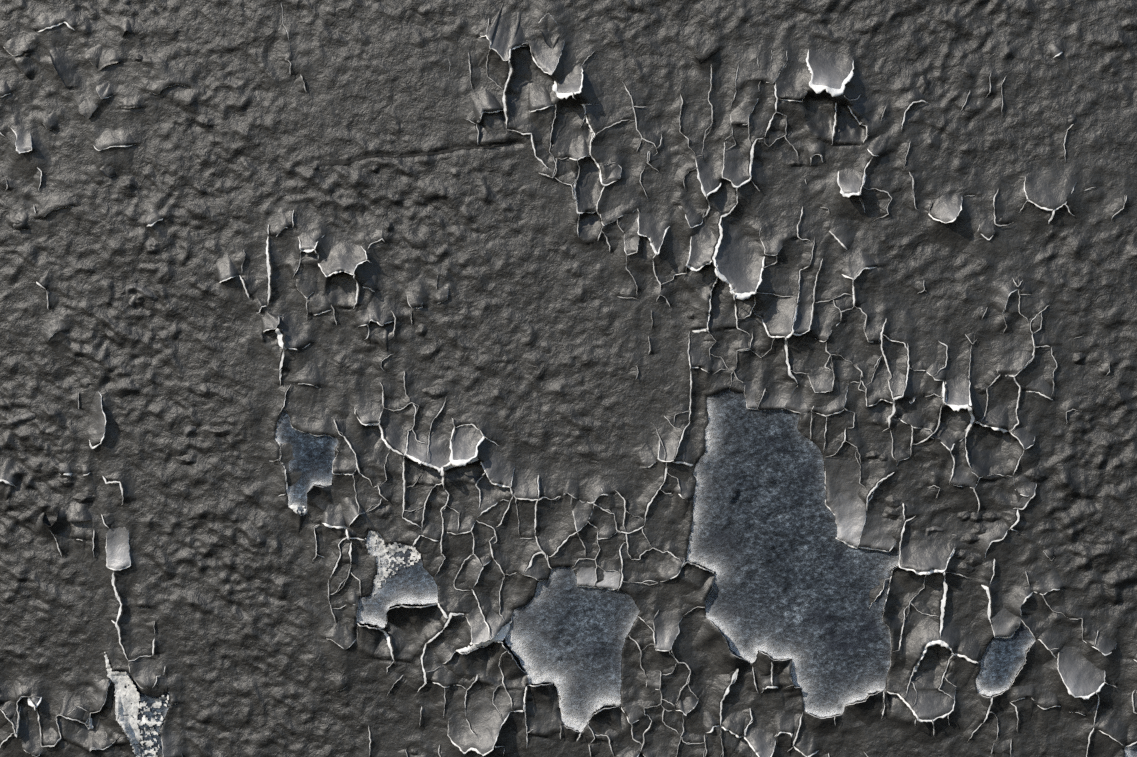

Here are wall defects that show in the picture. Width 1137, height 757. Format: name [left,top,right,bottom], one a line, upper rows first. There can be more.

crack [280,4,307,95]
crack [1049,44,1072,80]
crack [1121,18,1137,32]
crack [308,143,521,174]
crack [622,64,724,172]
crack [877,70,1006,207]
crack [1054,114,1077,160]
crack [1124,194,1134,208]
peeling [216,249,258,308]
flaking render [254,2,1137,757]
crack [628,329,776,428]
peeling [0,378,183,757]